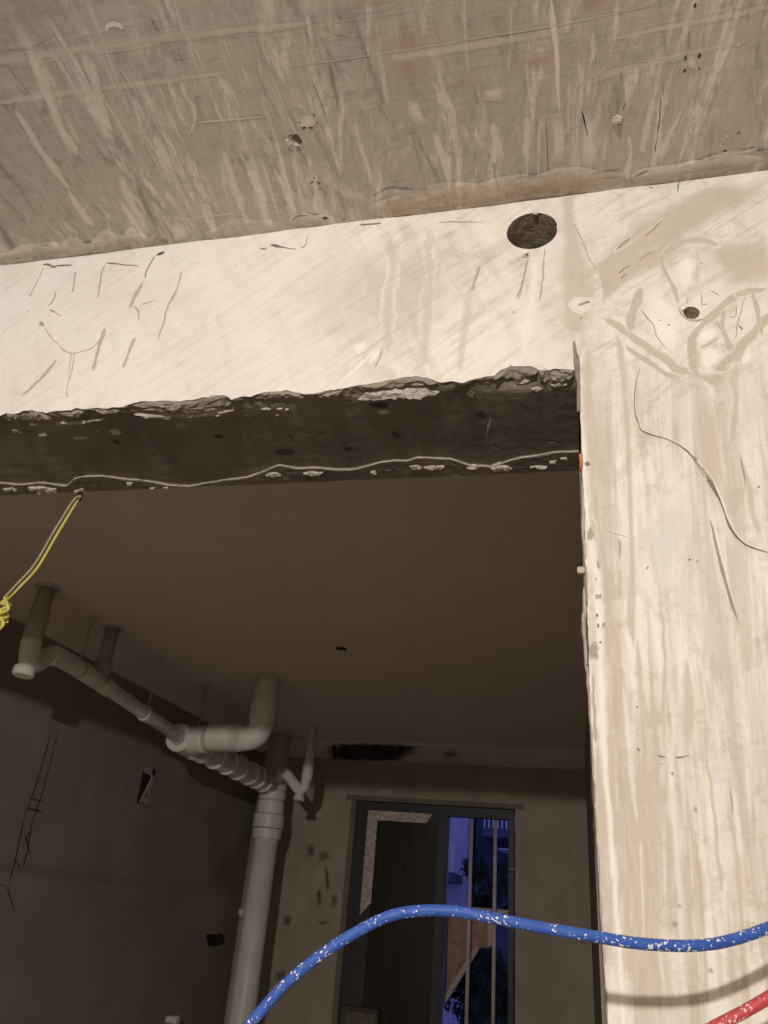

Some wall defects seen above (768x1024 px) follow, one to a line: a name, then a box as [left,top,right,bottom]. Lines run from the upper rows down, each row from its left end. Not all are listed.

spalling [0,341,628,1024]
crack [634,366,768,553]